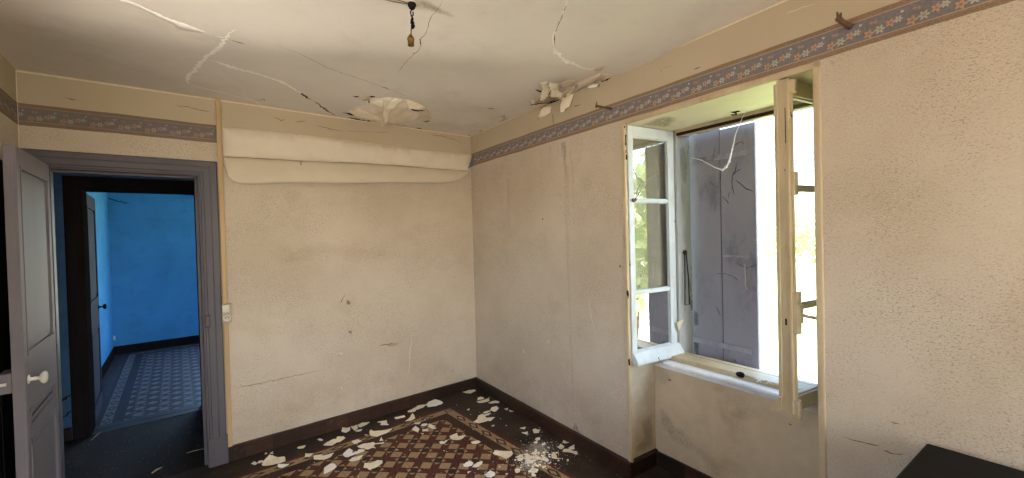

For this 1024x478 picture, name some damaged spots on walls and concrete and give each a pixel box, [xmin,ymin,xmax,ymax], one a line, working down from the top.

crack [180,29,383,133]
crack [277,2,442,95]
peeling [346,95,432,129]
peeling [529,72,610,124]
crack [552,0,607,71]